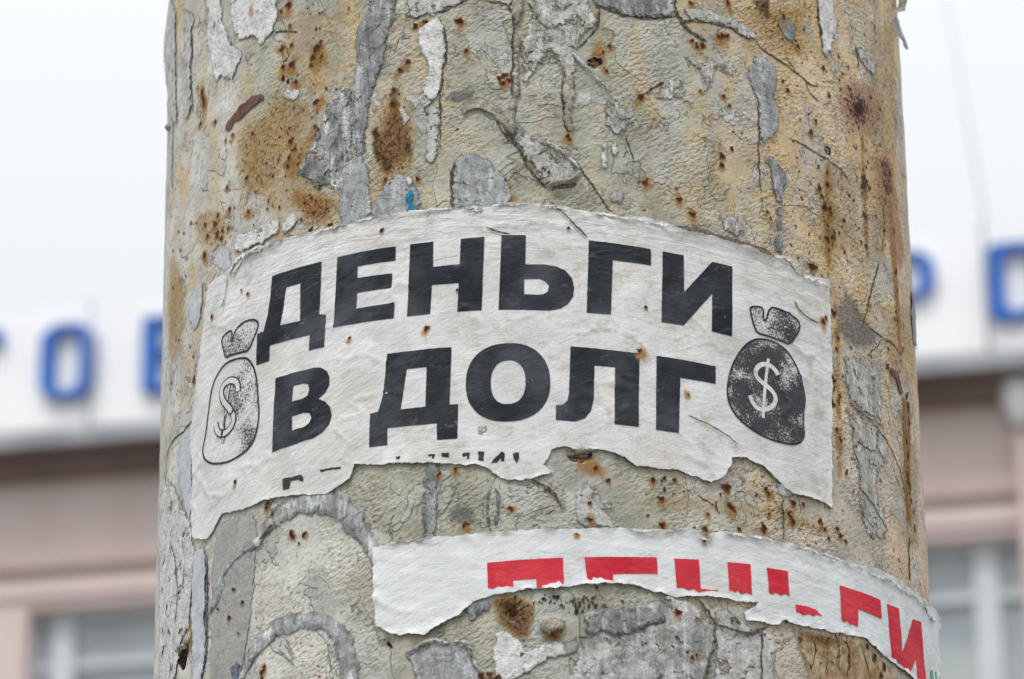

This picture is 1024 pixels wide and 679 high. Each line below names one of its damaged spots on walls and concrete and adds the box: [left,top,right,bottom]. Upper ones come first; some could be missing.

corrosion [178,1,337,263]
peeling [297,0,468,224]
corrosion [370,59,421,189]
peeling [450,153,511,209]
peeling [461,0,758,187]
peeling [684,52,788,255]
corrosion [807,53,904,378]
peeling [158,425,379,679]
corrosion [492,583,624,641]
corrosion [693,483,742,545]
corrosion [751,487,847,544]
peeling [844,355,888,539]